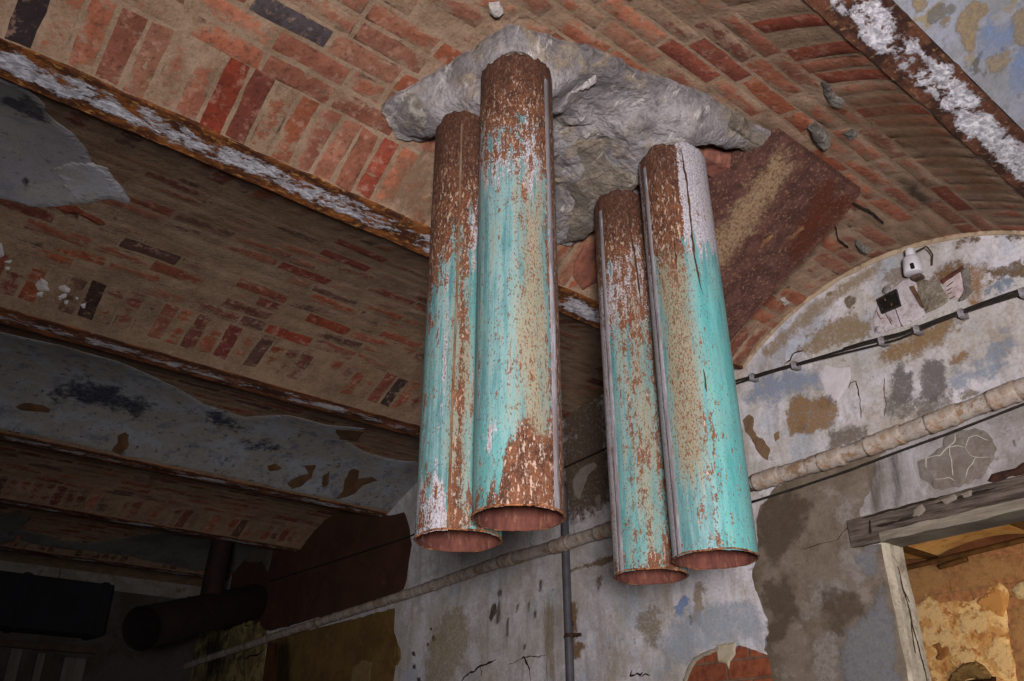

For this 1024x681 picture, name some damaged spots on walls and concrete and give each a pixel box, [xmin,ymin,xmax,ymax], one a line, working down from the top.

peeling [912,0,1024,75]
peeling [54,162,128,225]
peeling [16,403,50,413]
peeling [112,432,129,455]
peeling [287,465,330,489]
peeling [337,469,377,499]
crack [917,428,997,490]
flaking render [683,401,1024,681]
crack [898,567,927,680]
crack [462,655,545,681]